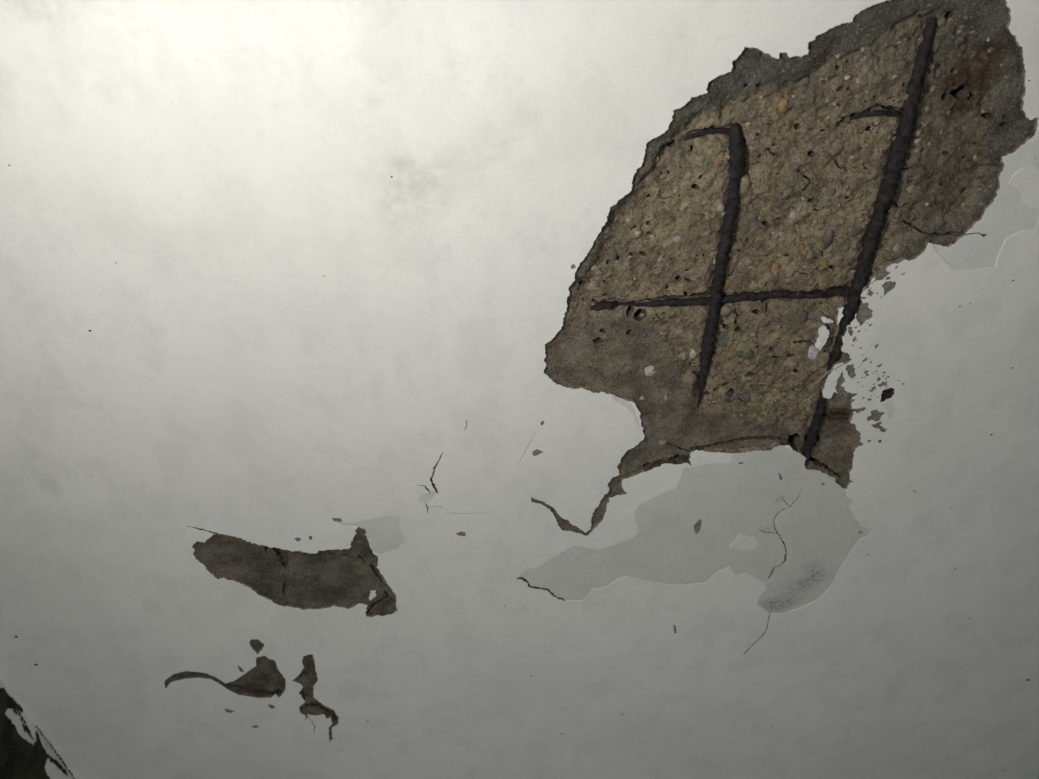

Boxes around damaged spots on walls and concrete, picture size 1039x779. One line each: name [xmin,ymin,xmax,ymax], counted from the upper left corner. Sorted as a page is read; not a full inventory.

spalling [518,0,1039,614]
spalling [192,516,405,617]
crack [419,453,480,514]
crack [758,490,802,578]
spalling [164,639,339,742]